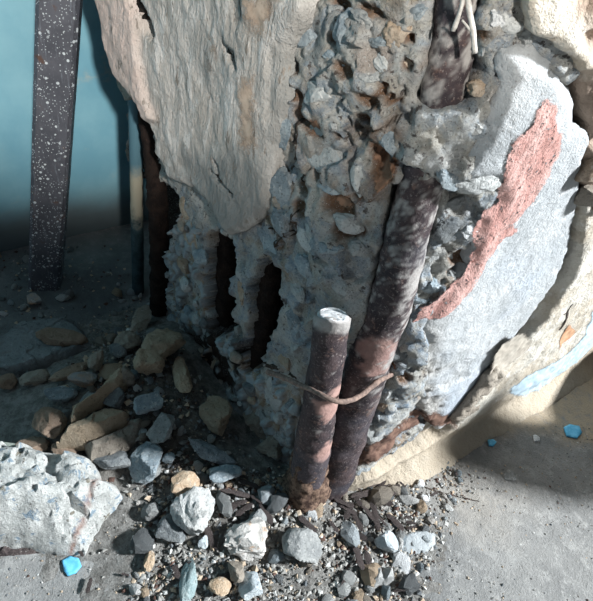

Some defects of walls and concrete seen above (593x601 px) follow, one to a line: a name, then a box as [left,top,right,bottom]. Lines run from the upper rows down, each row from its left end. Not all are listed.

crack [137,0,151,20]
spalling [94,0,593,514]
rust [358,409,458,466]